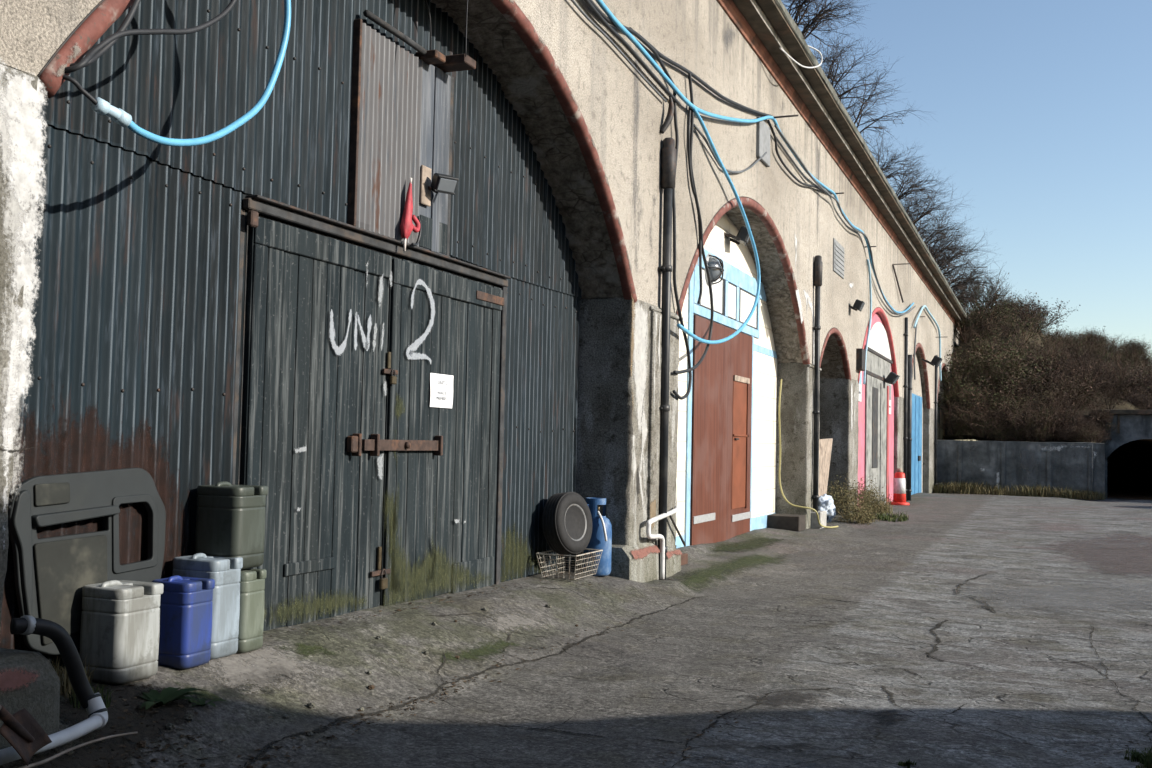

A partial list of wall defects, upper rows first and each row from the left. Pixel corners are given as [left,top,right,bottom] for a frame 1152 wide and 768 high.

rust [8,405,190,578]
rust [0,532,62,666]
crack [158,574,1152,768]